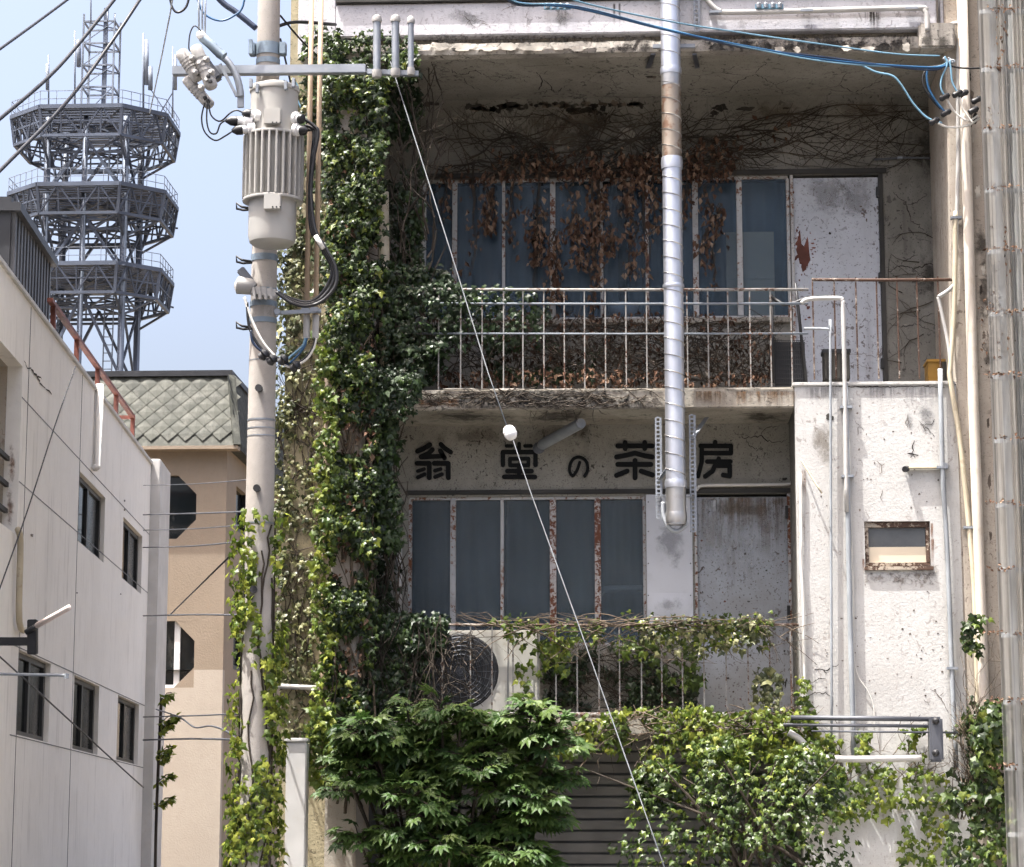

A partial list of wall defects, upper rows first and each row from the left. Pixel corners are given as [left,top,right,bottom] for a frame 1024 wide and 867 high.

spalling [465,100,645,130]
crack [889,255,933,277]